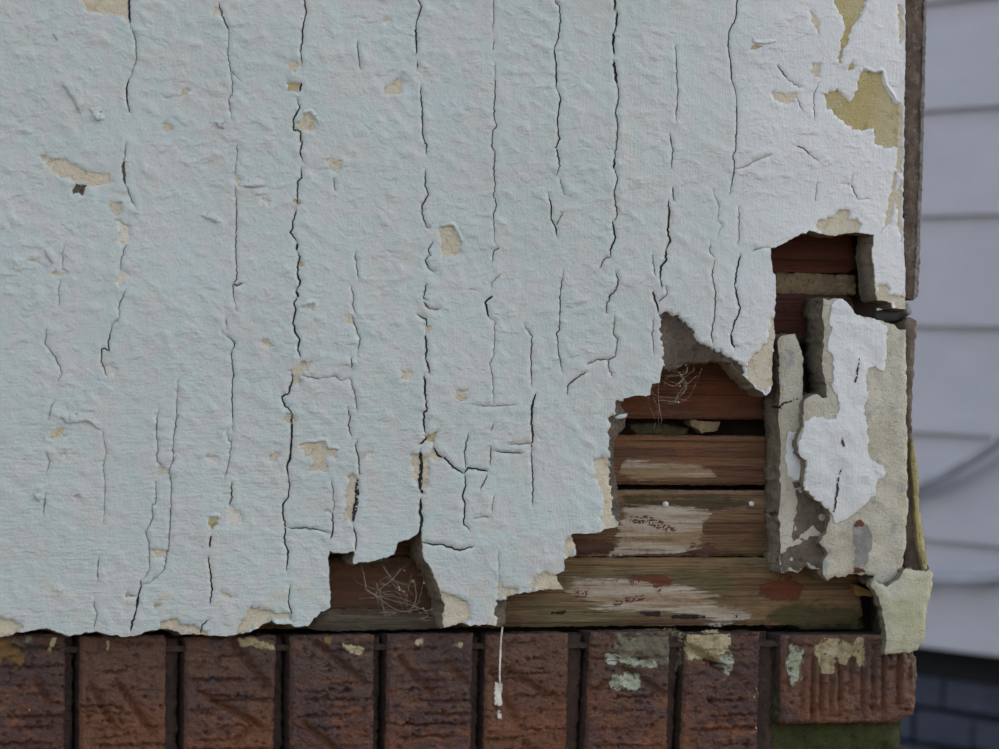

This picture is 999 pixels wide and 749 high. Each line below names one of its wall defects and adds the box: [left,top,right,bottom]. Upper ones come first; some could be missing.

crack [130,382,178,630]
crack [225,144,238,504]
crack [281,0,361,614]
peeling [410,432,445,488]
spalling [403,525,562,629]
crack [415,0,619,551]
spalling [593,395,646,529]
crack [651,46,679,351]
spalling [659,312,775,397]
crack [709,0,770,348]
peeling [794,0,905,312]
flaking render [865,567,933,656]